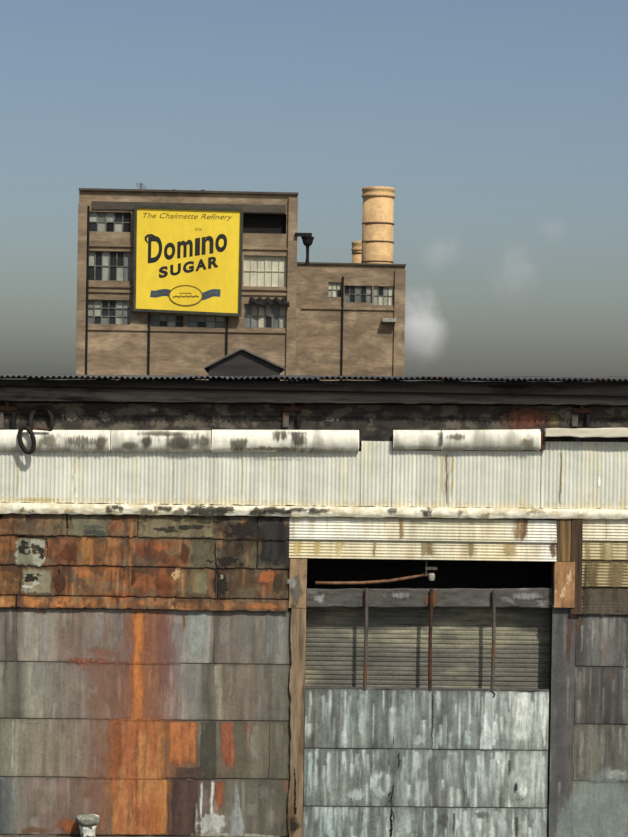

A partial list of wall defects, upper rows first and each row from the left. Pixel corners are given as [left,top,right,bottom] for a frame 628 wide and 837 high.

water stain [236,431,314,452]
corrosion [500,406,559,429]
peeling [15,534,51,593]
corrosion [258,571,276,583]
corrosion [69,611,197,835]
corrosion [213,782,224,814]
water stain [168,721,279,837]
corrosion [221,722,234,766]
water stain [320,751,385,837]
crack [388,737,403,837]
water stain [464,713,545,800]
water stain [504,692,546,745]